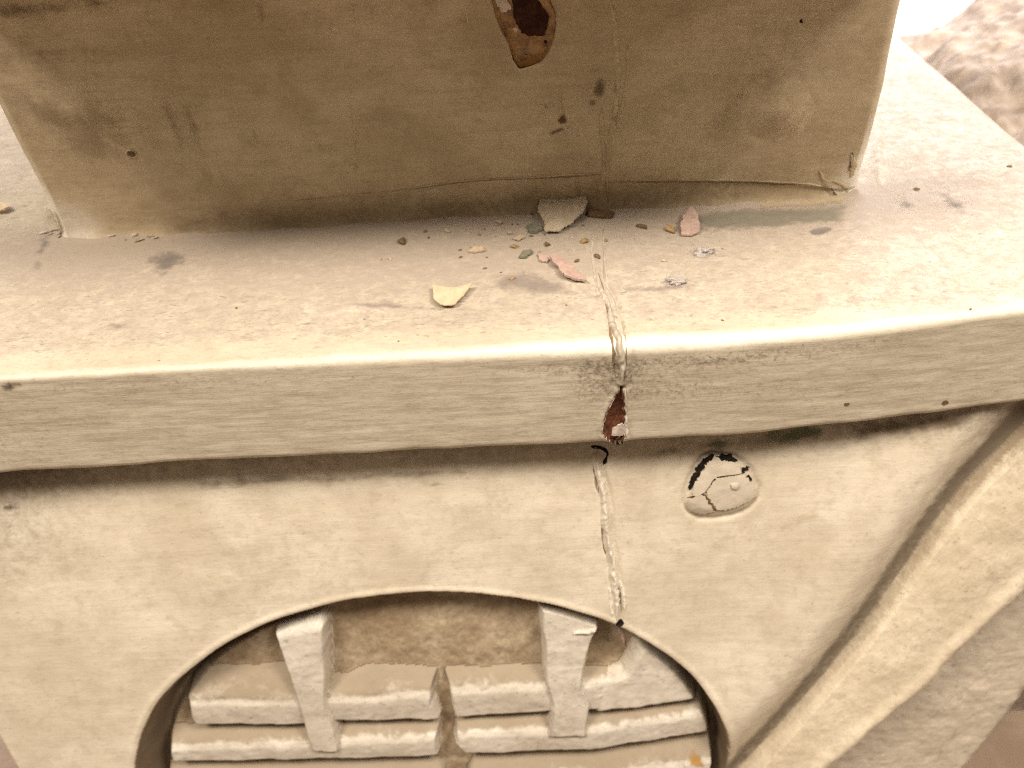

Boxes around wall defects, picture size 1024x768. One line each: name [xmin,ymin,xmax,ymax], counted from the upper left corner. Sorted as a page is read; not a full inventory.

peeling [492,0,556,69]
crack [296,0,837,202]
crack [590,228,627,383]
spalling [602,386,629,445]
crack [574,445,627,645]